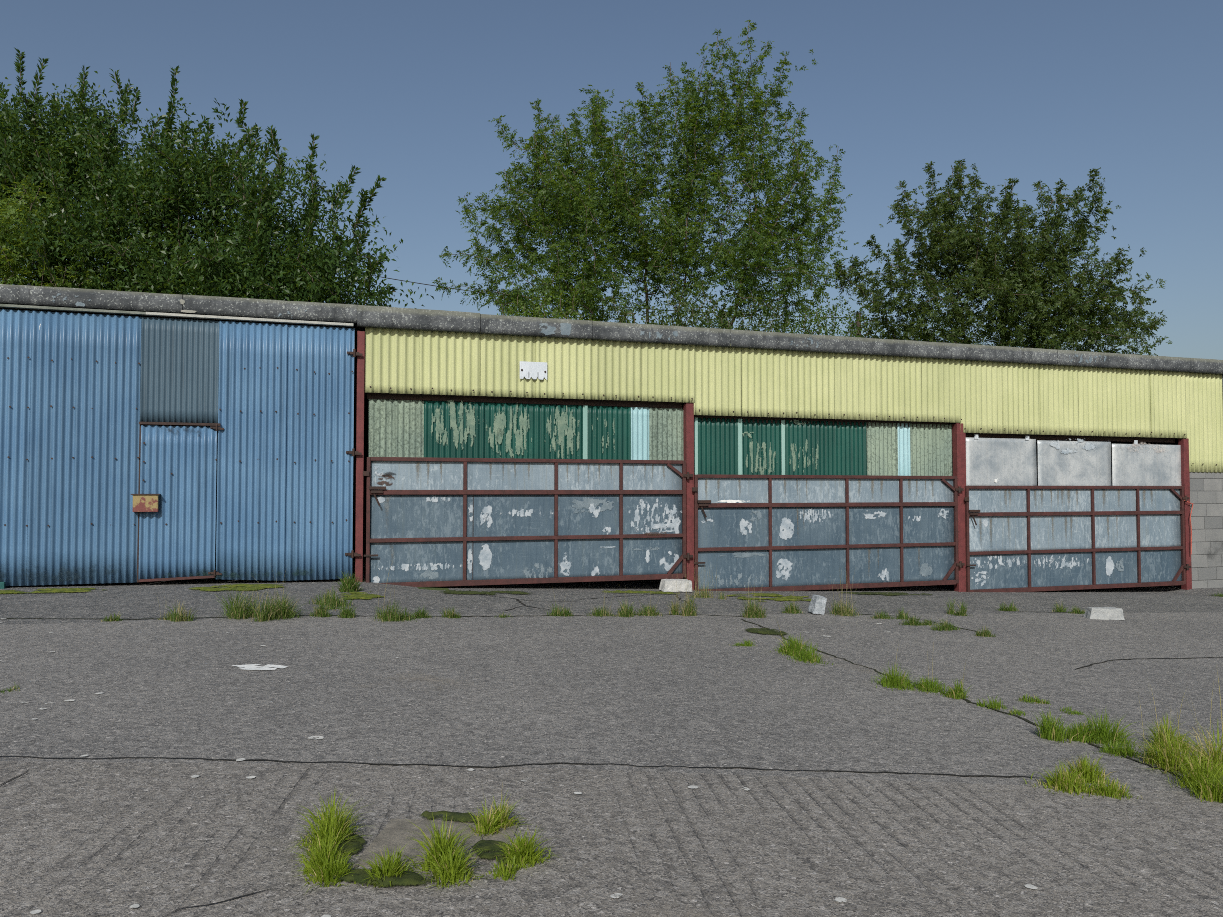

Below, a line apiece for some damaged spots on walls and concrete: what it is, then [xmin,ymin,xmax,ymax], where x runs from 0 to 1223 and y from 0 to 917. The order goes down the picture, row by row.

peeling [431,400,532,457]
peeling [546,406,615,459]
peeling [742,432,775,475]
peeling [468,505,492,528]
peeling [572,498,615,548]
peeling [629,498,682,571]
peeling [779,508,833,540]
peeling [373,544,492,583]
peeling [524,553,571,578]
crack [1076,656,1210,669]
crack [1,756,1038,785]
crack [165,887,288,916]